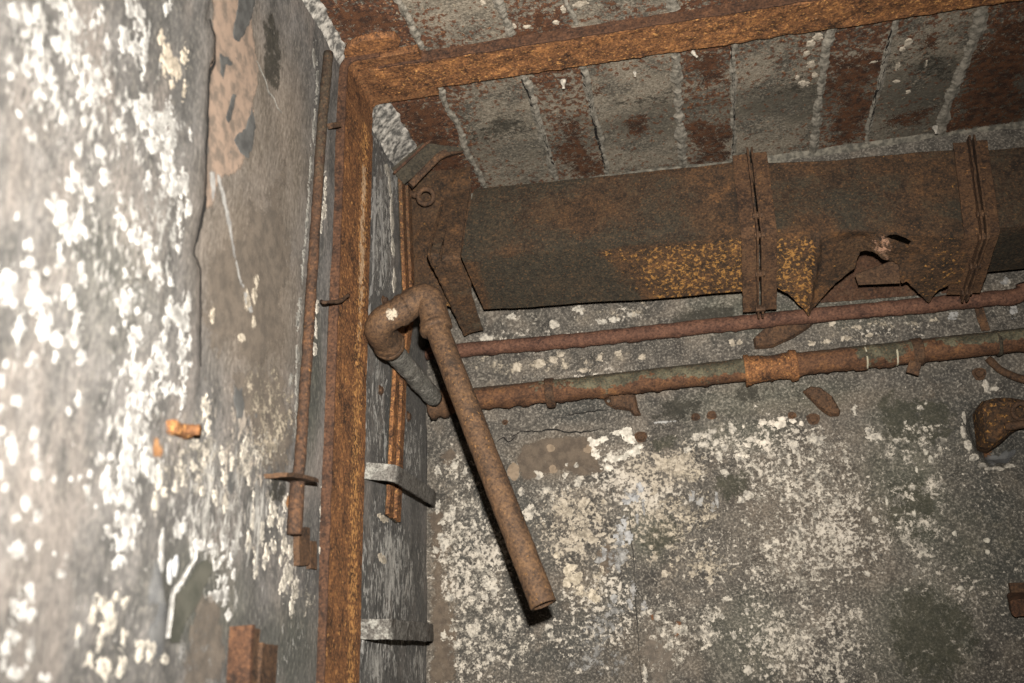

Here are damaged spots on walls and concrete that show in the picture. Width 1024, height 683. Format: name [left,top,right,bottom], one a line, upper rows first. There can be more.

peeling [296,40,327,332]
corrosion [398,99,469,170]
corrosion [552,116,603,177]
corrosion [691,47,729,92]
corrosion [685,119,736,164]
corrosion [824,46,890,144]
corrosion [946,11,1024,132]
peeling [0,0,316,683]
leakage [662,399,702,421]
leakage [427,449,555,683]
leakage [518,416,881,683]
leakage [864,402,957,592]